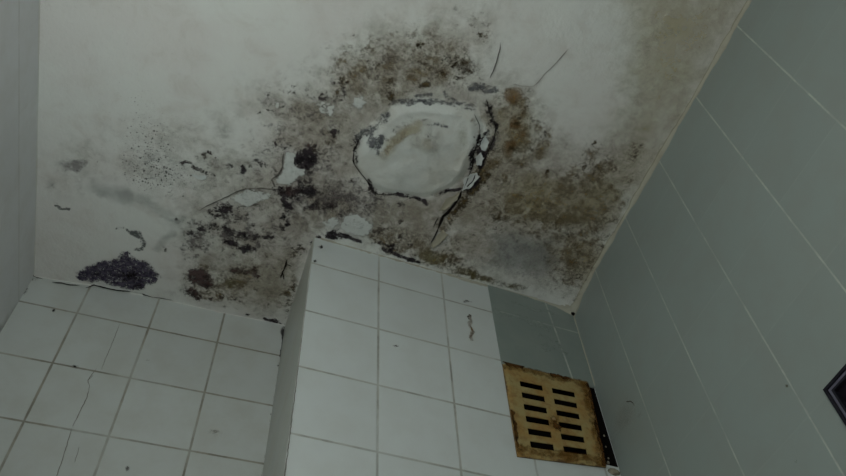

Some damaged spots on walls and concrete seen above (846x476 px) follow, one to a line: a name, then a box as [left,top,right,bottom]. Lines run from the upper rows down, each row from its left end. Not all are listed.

damp [124,112,216,197]
crack [201,153,284,210]
peeling [276,152,306,186]
damp [181,43,624,301]
crack [431,100,496,243]
damp [76,228,158,290]
peeling [322,213,374,236]
crack [56,324,120,476]
rust [503,361,607,466]